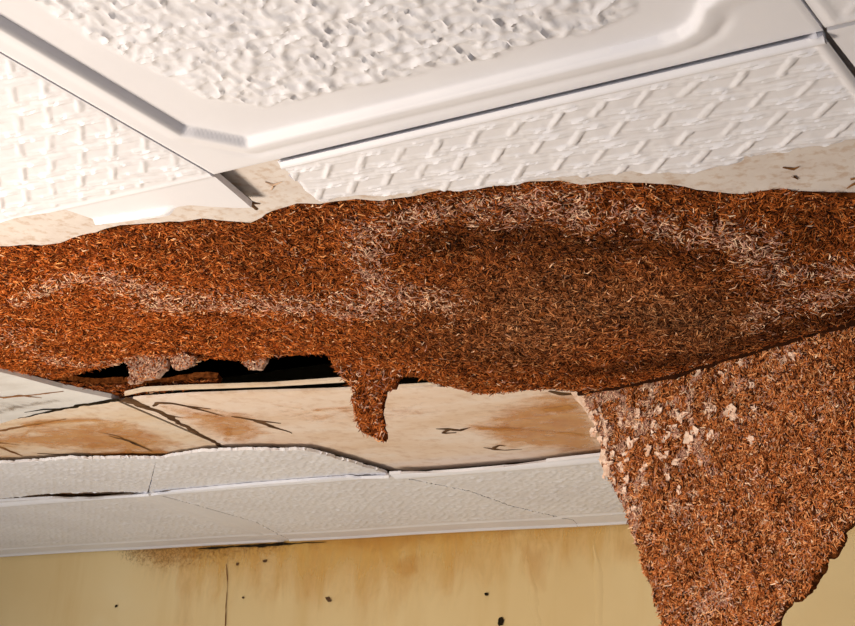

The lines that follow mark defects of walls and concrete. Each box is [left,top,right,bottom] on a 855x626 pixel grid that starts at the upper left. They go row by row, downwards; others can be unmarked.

peeling [0,181,855,443]
damp [0,419,165,456]
crack [0,391,292,457]
crack [316,449,390,472]
crack [423,460,541,471]
damp [478,397,593,450]
peeling [589,405,714,495]
crack [47,491,118,499]
damp [193,531,492,576]